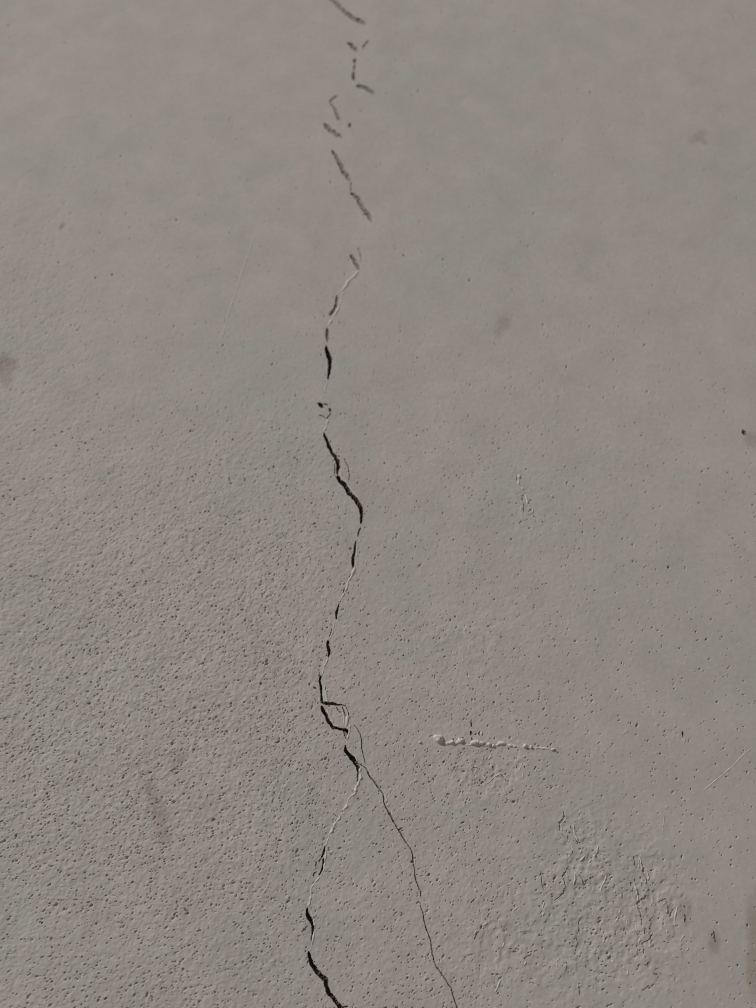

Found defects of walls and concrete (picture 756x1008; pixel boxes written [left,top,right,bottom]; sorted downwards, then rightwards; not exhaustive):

crack [323,0,375,223]
crack [301,248,458,1008]